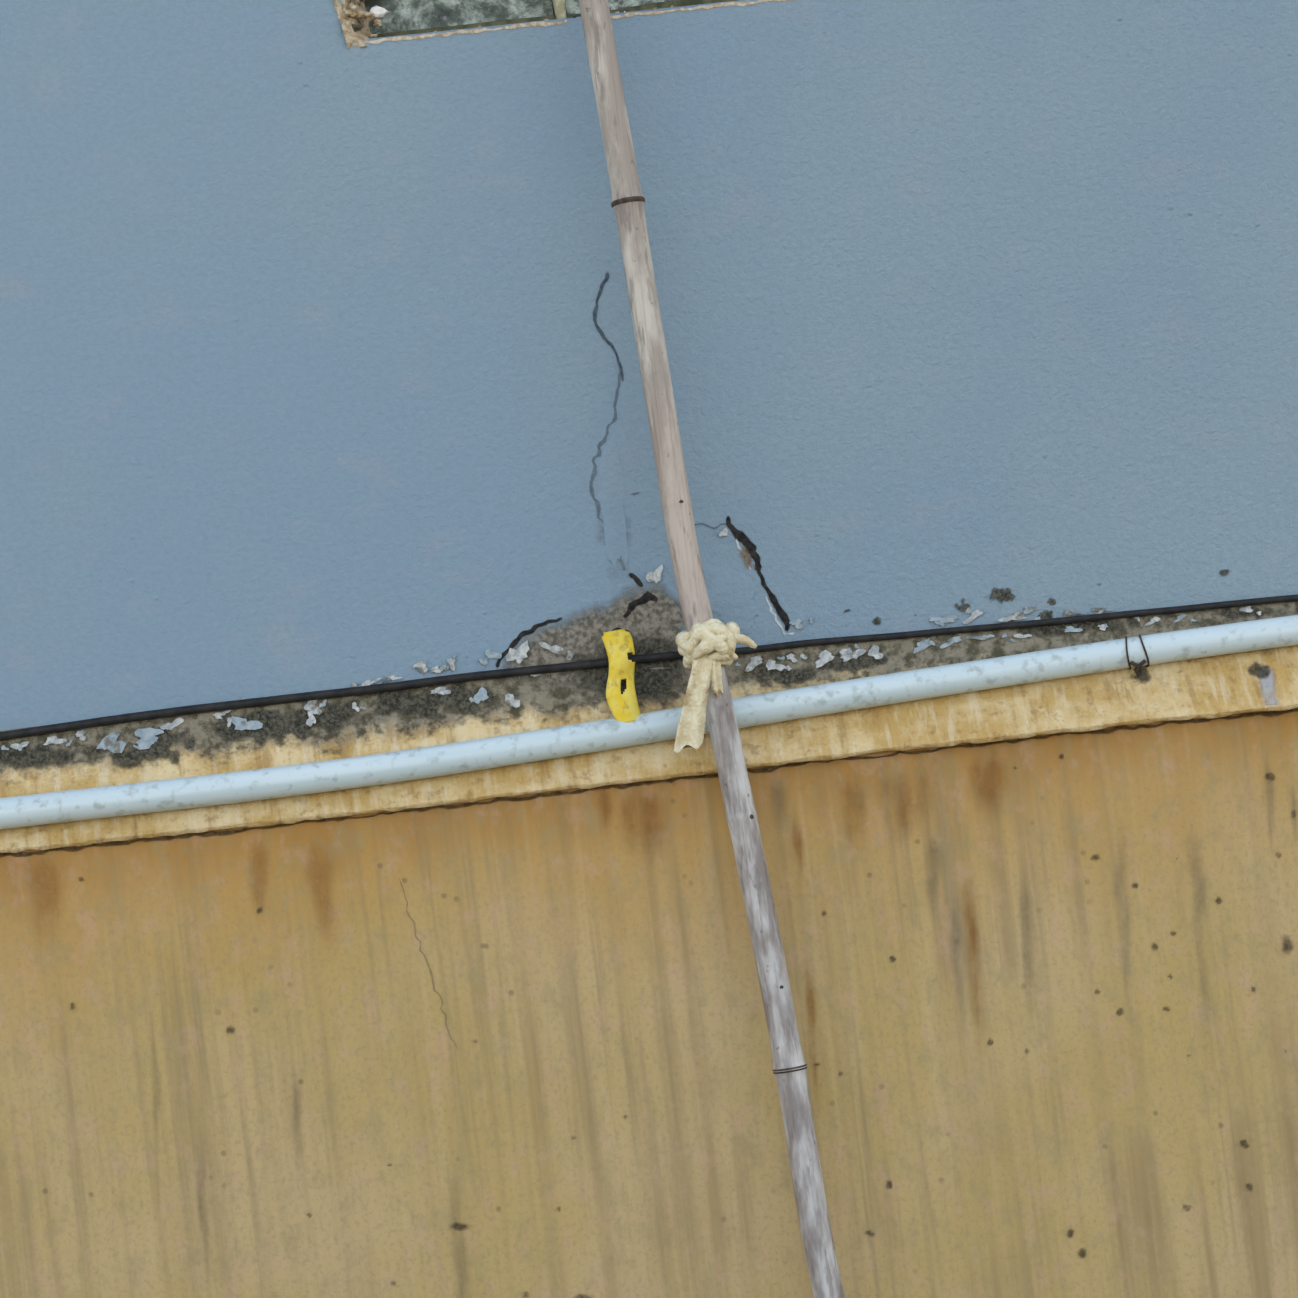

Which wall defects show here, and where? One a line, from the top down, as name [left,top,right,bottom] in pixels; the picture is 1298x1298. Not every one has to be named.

crack [590,273,624,529]
crack [695,516,795,635]
flaking render [478,565,685,708]
peeling [735,644,883,672]
water stain [752,653,888,684]
peeling [1,717,184,753]
water stain [0,728,194,769]
peeling [214,710,263,731]
water stain [215,700,359,744]
peeling [304,699,327,727]
water stain [377,681,494,718]
crack [0,708,1298,857]